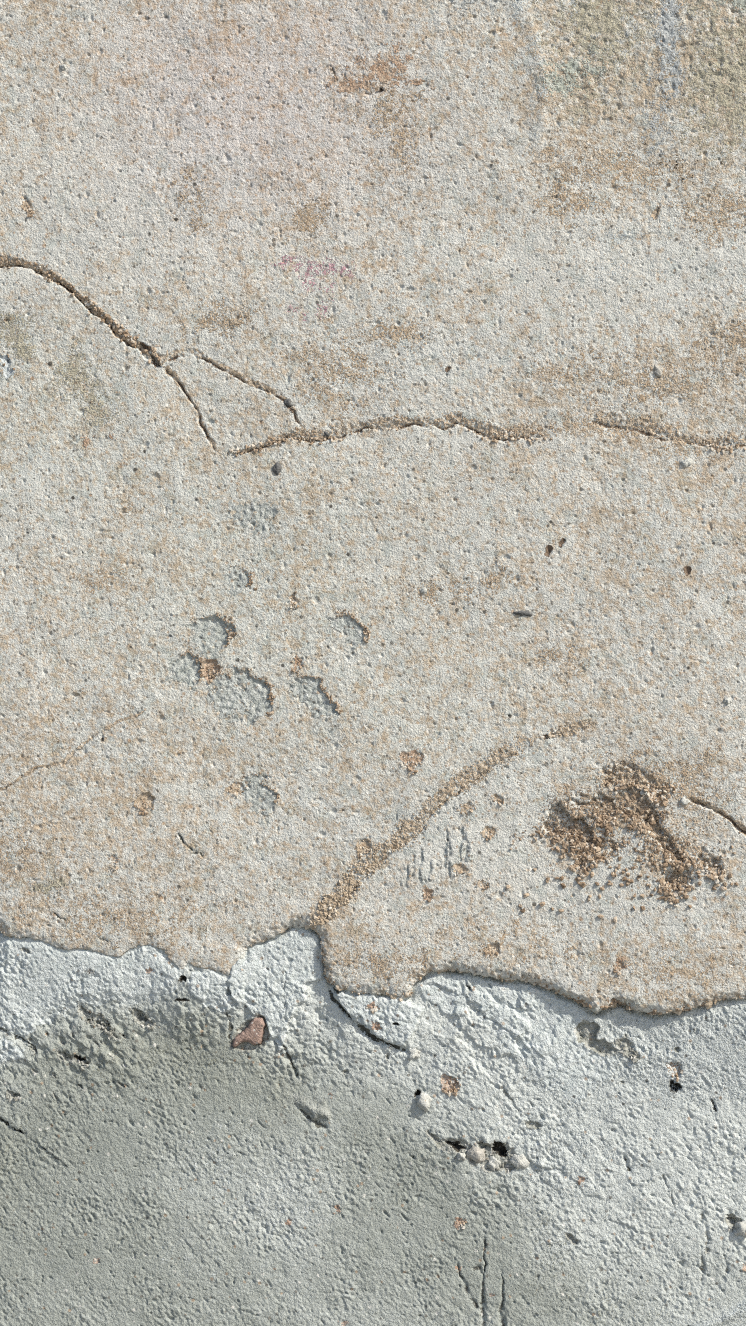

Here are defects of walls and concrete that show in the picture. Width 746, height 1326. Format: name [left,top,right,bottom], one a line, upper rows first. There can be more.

crack [0,253,746,457]
spalling [328,610,373,649]
spalling [165,612,342,727]
spalling [457,794,509,841]
spalling [506,730,746,922]
spalling [422,886,434,903]
spalling [452,863,489,892]
peeling [0,925,746,1112]
spalling [425,1130,516,1173]
spalling [724,1214,742,1236]